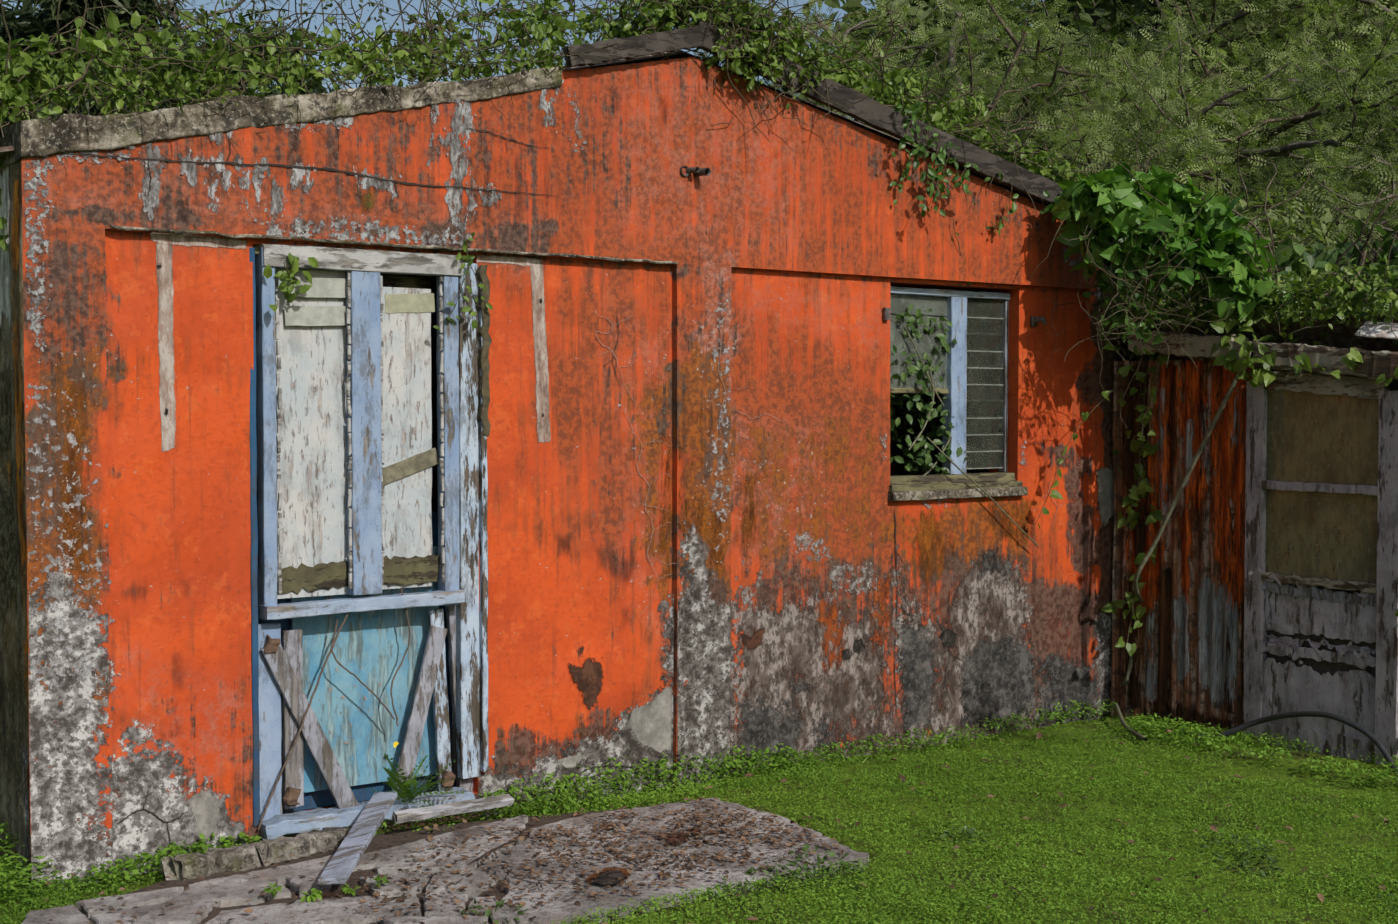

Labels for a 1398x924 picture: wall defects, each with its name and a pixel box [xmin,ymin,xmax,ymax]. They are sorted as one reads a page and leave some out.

peeling [0,89,502,364]
water stain [7,179,29,718]
peeling [18,384,250,892]
water stain [736,586,765,651]
water stain [793,531,904,716]
rust [1120,360,1250,738]